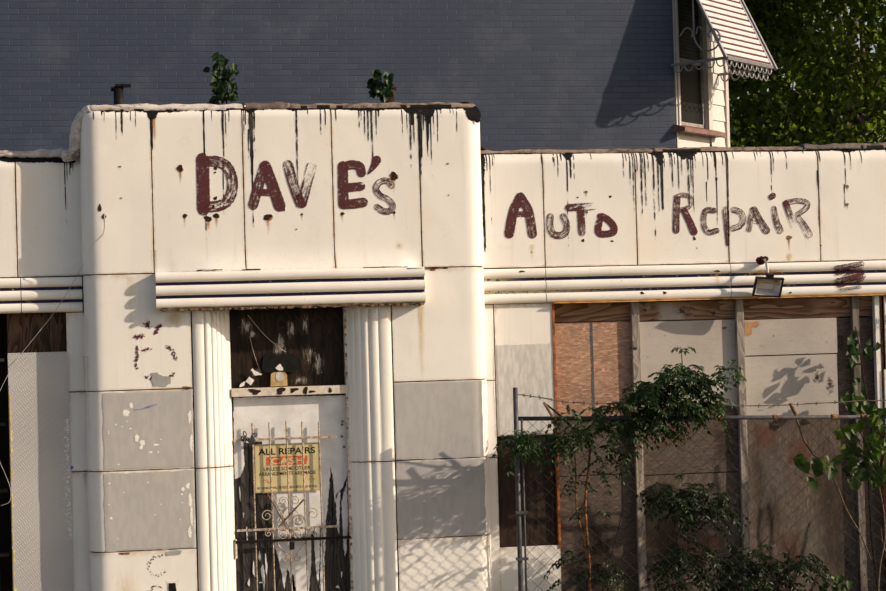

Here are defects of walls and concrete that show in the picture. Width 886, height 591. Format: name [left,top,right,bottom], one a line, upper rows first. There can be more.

leakage [203,110,229,197]
leakage [243,111,255,188]
leakage [358,110,379,158]
leakage [401,109,457,174]
leakage [481,154,495,251]
leakage [541,154,575,220]
leakage [622,152,734,235]
peeling [233,387,349,591]